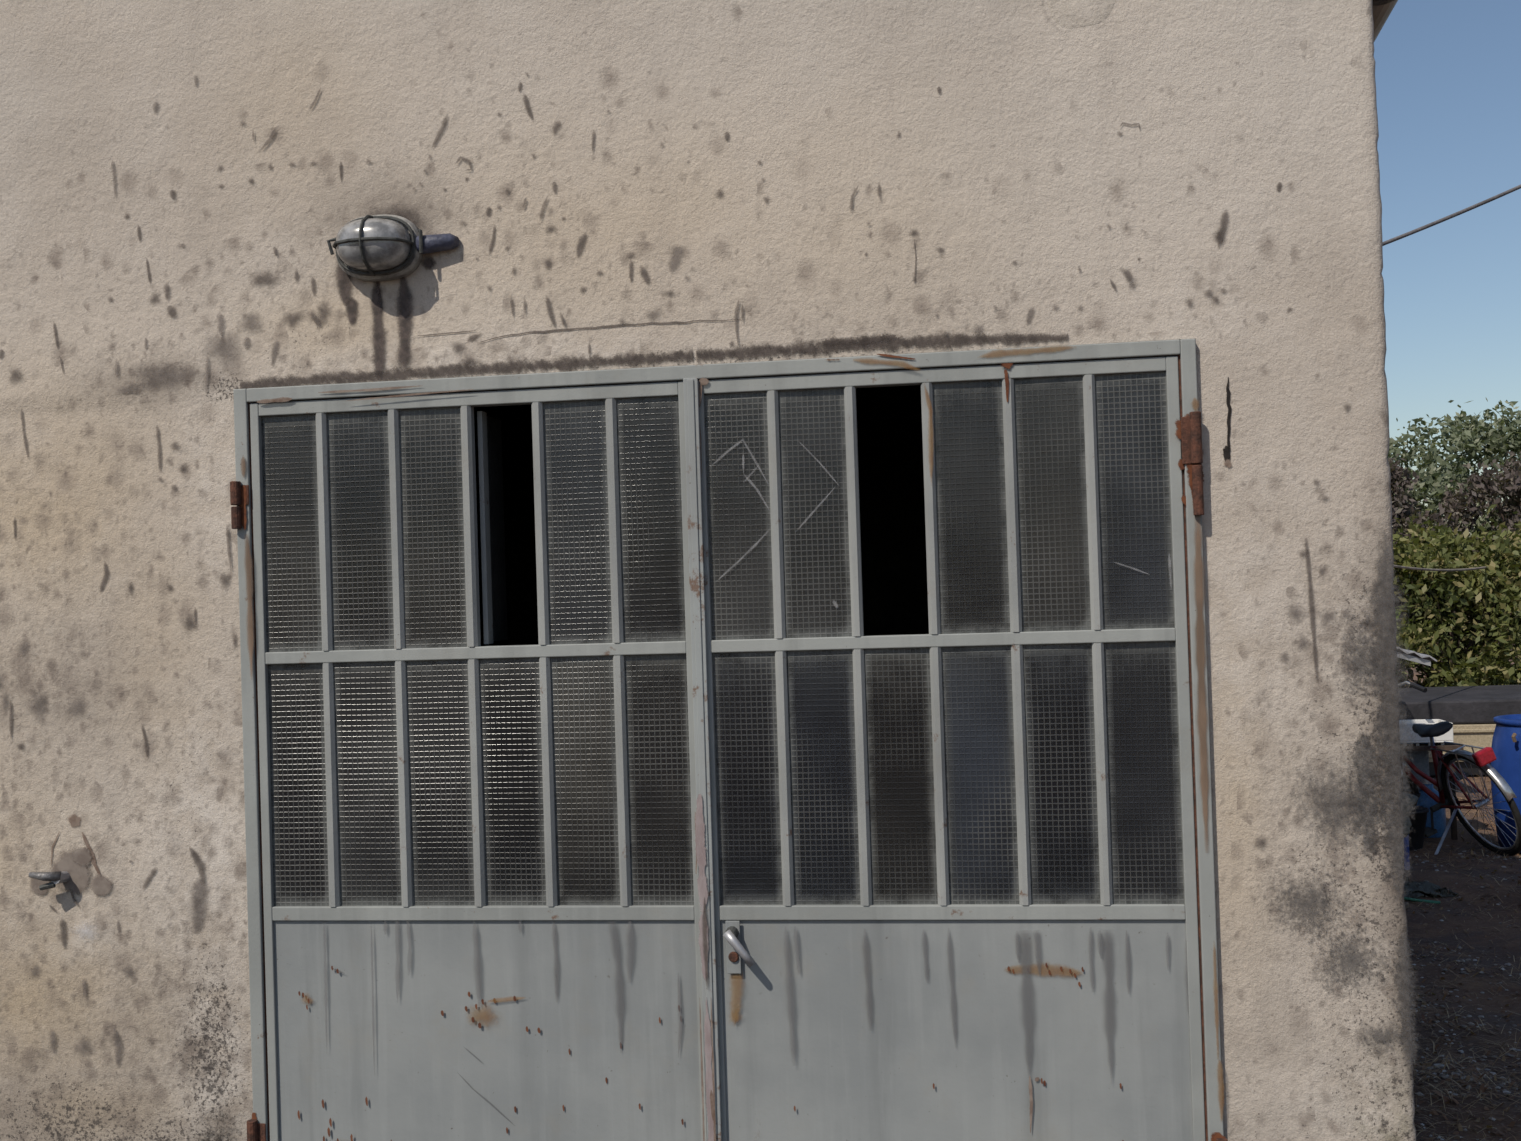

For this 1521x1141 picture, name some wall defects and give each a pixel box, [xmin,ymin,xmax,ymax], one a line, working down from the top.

water stain [233,264,1068,399]
water stain [1293,544,1414,892]
water stain [1277,873,1417,1063]